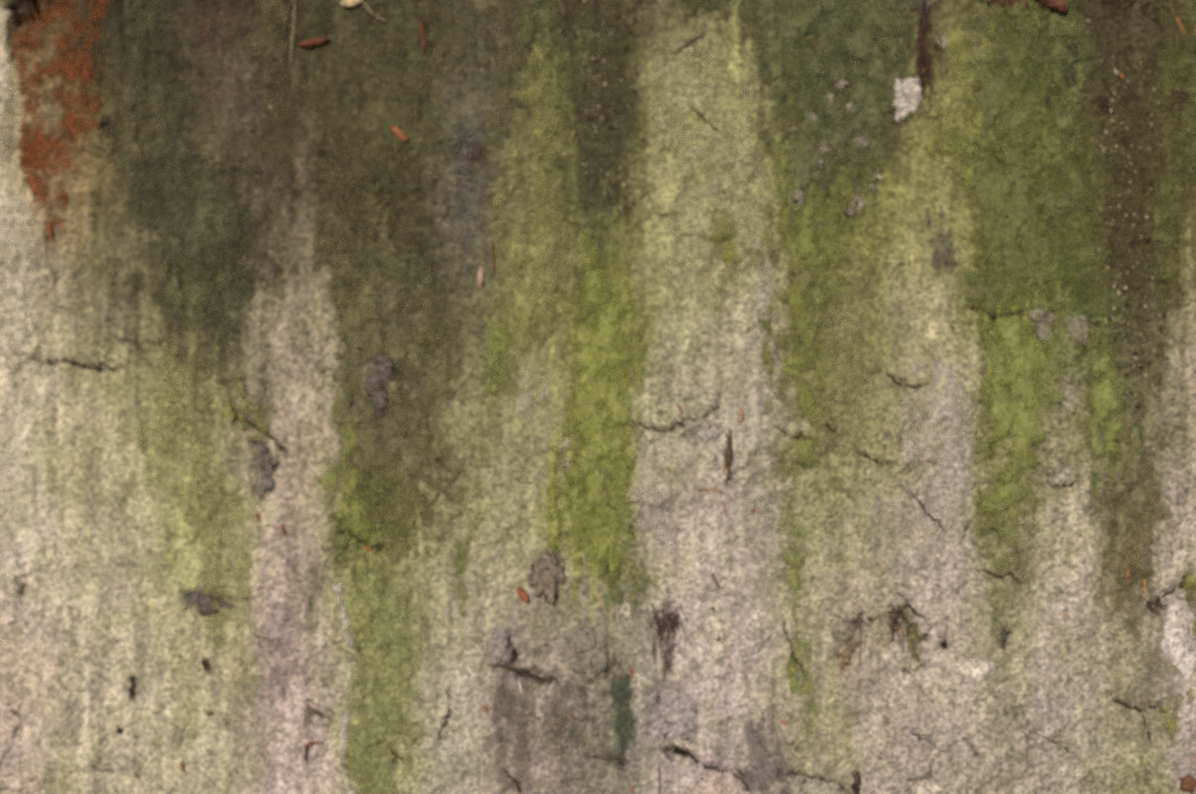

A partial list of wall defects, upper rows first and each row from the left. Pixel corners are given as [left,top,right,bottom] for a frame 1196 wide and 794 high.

leakage [0,3,17,144]
leakage [0,164,36,560]
rust [11,0,108,242]
crack [23,351,128,370]
leakage [102,0,305,645]
leakage [313,96,446,330]
leakage [552,0,636,210]
crack [620,384,726,442]
leakage [652,39,784,451]
leakage [1100,461,1162,634]
crack [664,746,750,791]
crack [784,764,860,794]